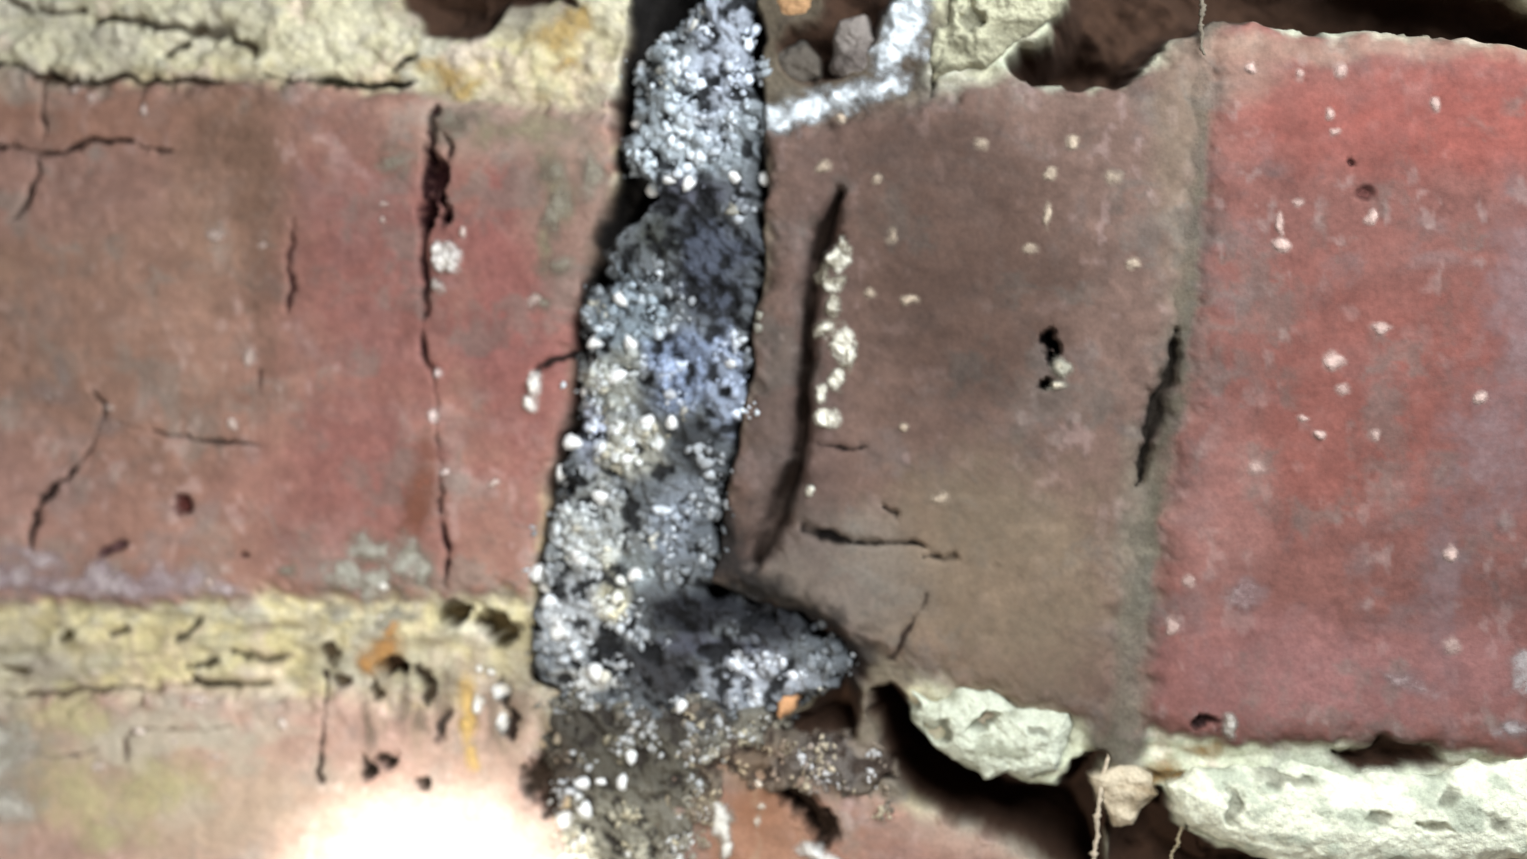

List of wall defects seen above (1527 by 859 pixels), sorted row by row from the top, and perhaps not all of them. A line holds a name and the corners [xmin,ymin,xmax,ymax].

crack [0,0,454,363]
crack [535,0,705,464]
crack [707,0,939,617]
crack [29,392,107,548]
crack [156,430,247,444]
crack [439,500,451,576]
crack [535,505,556,625]
crack [807,622,828,641]
spalling [522,752,561,818]
spalling [782,787,838,846]